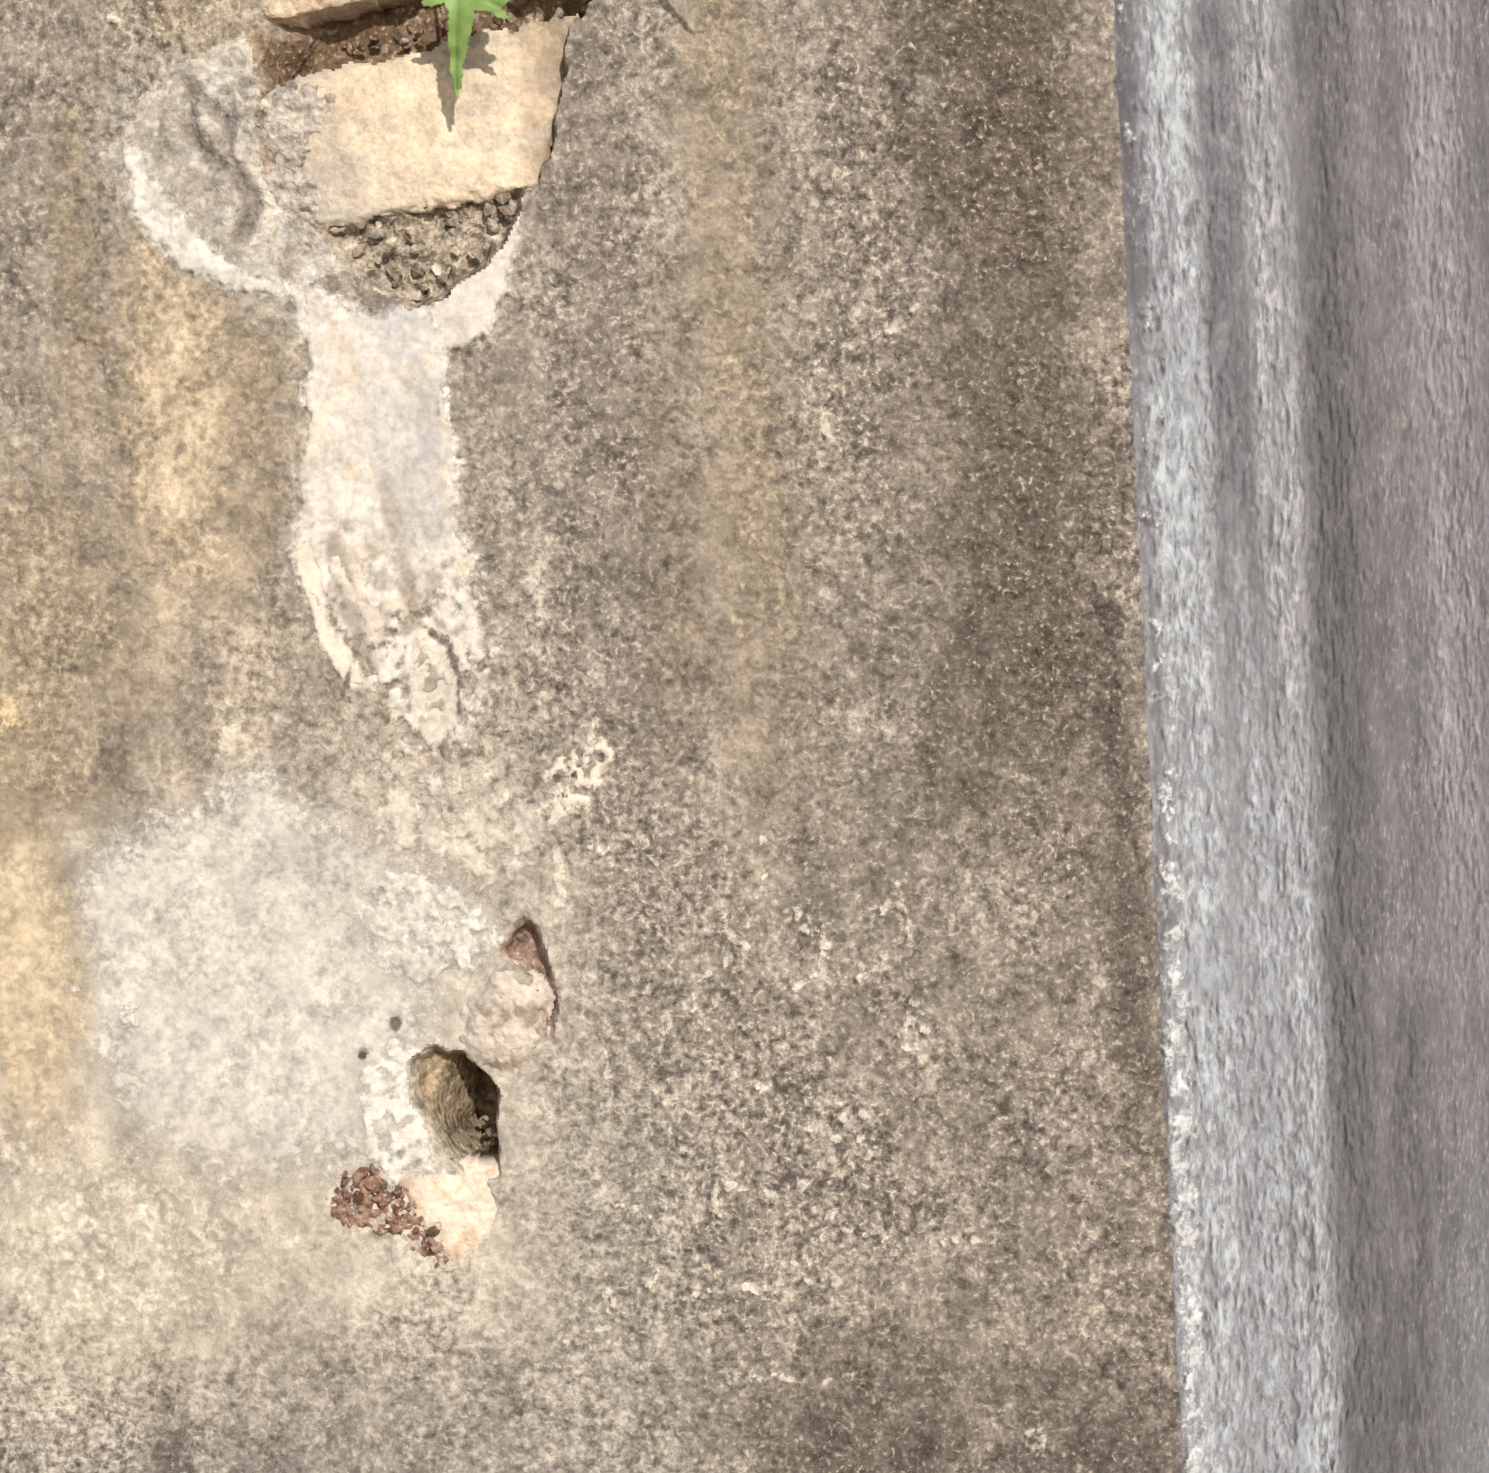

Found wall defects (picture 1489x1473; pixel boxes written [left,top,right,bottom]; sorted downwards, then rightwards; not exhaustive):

water stain [0,482,303,1366]
water stain [114,231,278,590]
spalling [76,0,615,1268]
spalling [587,843,629,872]